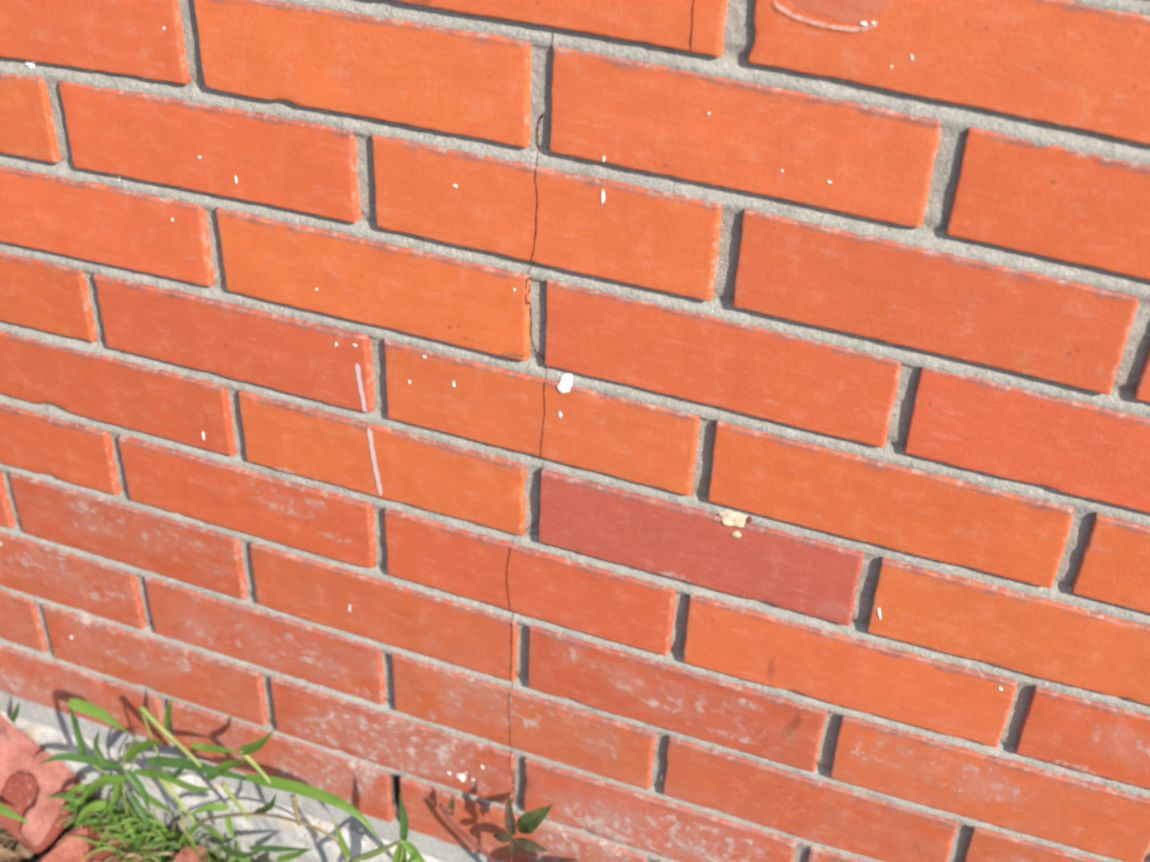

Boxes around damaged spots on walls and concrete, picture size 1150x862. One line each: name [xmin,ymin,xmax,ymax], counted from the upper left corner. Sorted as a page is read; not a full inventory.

crack [525,113,547,492]
crack [506,519,539,803]